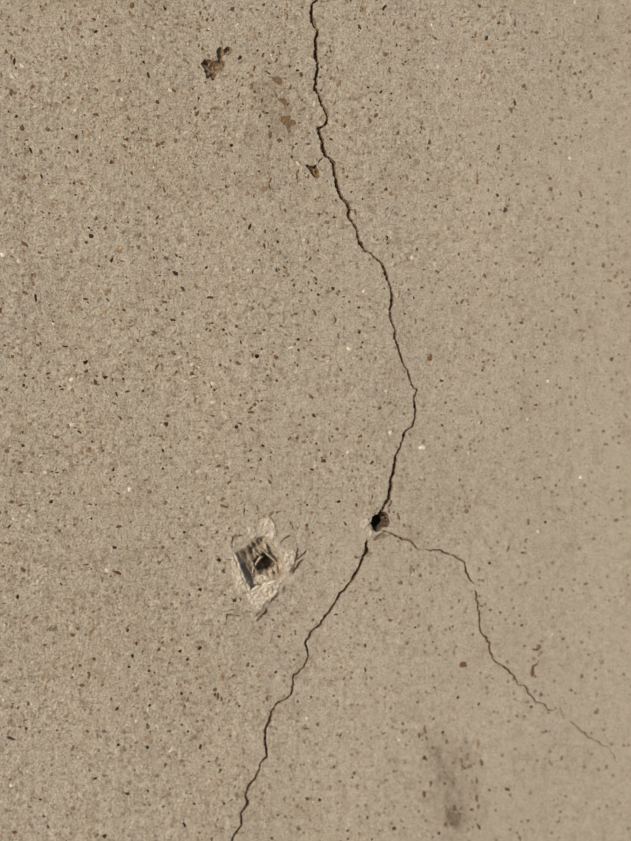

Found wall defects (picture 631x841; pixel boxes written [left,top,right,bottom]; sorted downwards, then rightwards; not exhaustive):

spalling [222,516,307,622]
crack [231,0,617,841]